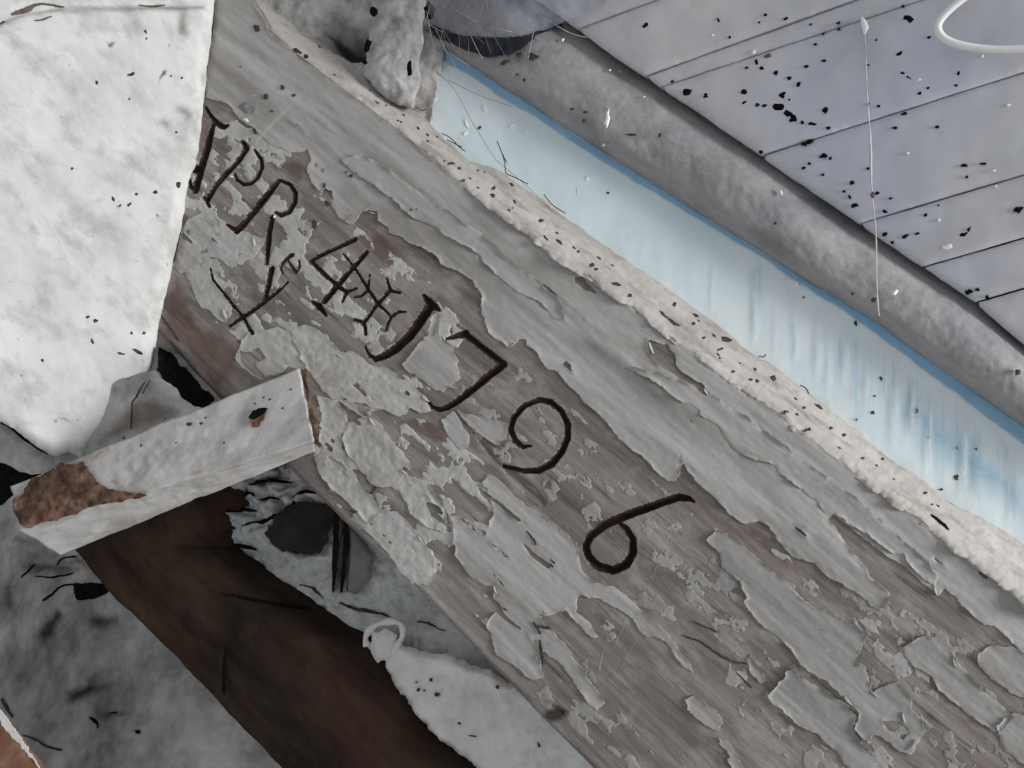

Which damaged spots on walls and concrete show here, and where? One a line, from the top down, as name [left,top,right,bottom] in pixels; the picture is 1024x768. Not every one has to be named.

peeling [173,180,349,323]
spalling [157,347,215,408]
peeling [205,0,1024,768]